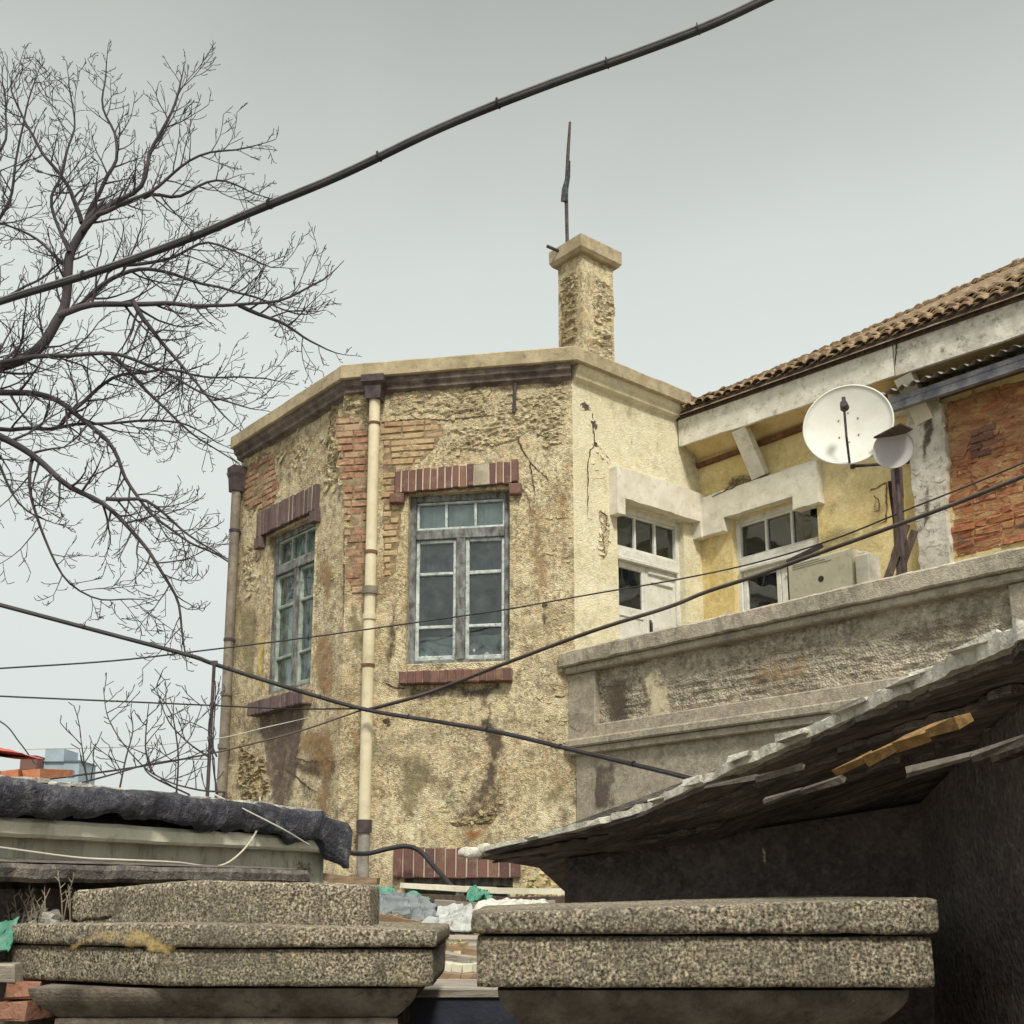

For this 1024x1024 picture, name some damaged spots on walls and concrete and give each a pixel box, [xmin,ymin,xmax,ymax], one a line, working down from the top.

spalling [559,269,579,347]
spalling [590,278,615,361]
spalling [241,386,567,599]
crack [381,401,550,520]
crack [587,413,610,552]
spalling [912,380,1024,557]
spalling [236,737,270,801]
damp [260,707,335,812]
damp [411,683,504,818]
damp [595,764,614,807]